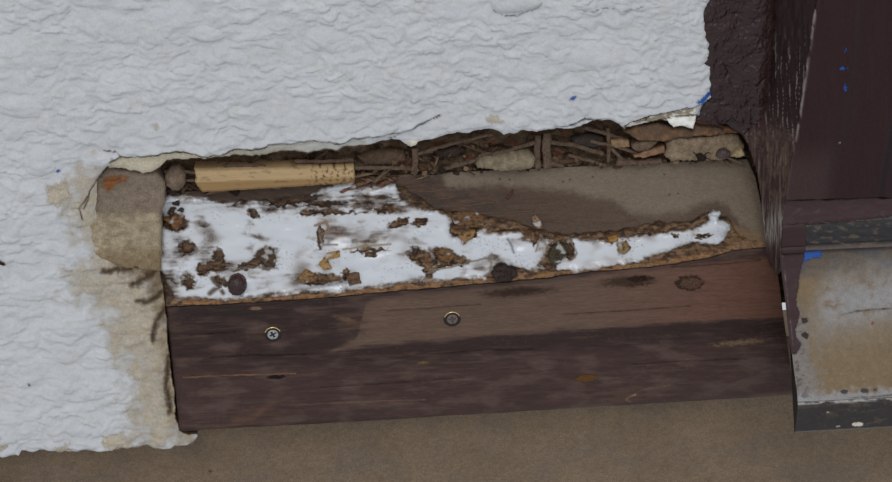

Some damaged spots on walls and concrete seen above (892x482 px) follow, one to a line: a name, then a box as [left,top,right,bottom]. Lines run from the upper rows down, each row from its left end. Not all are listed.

spalling [623,108,696,129]
peeling [110,149,274,173]
leakage [102,266,156,287]
leakage [151,308,165,342]
leakage [164,355,172,414]